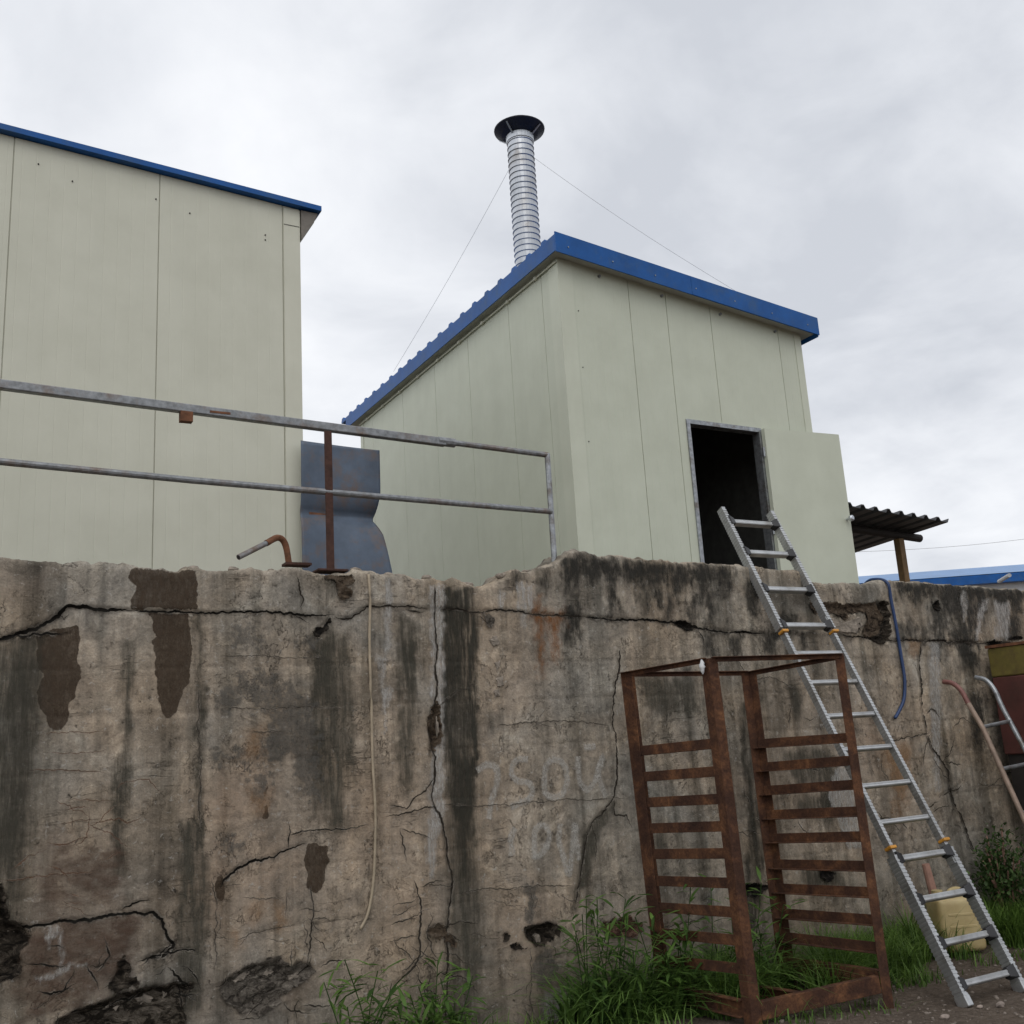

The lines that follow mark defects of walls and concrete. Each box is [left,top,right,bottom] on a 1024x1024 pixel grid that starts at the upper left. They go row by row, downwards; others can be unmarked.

water stain [128,568,201,718]
peeling [810,600,892,645]
water stain [0,625,81,918]
water stain [179,627,353,1010]
crack [0,577,814,1023]
spalling [427,701,443,752]
water stain [428,585,482,1021]
crack [843,624,1011,853]
spalling [0,883,31,982]
spalling [55,955,195,1024]
spalling [218,955,316,1017]
spalling [503,922,561,950]